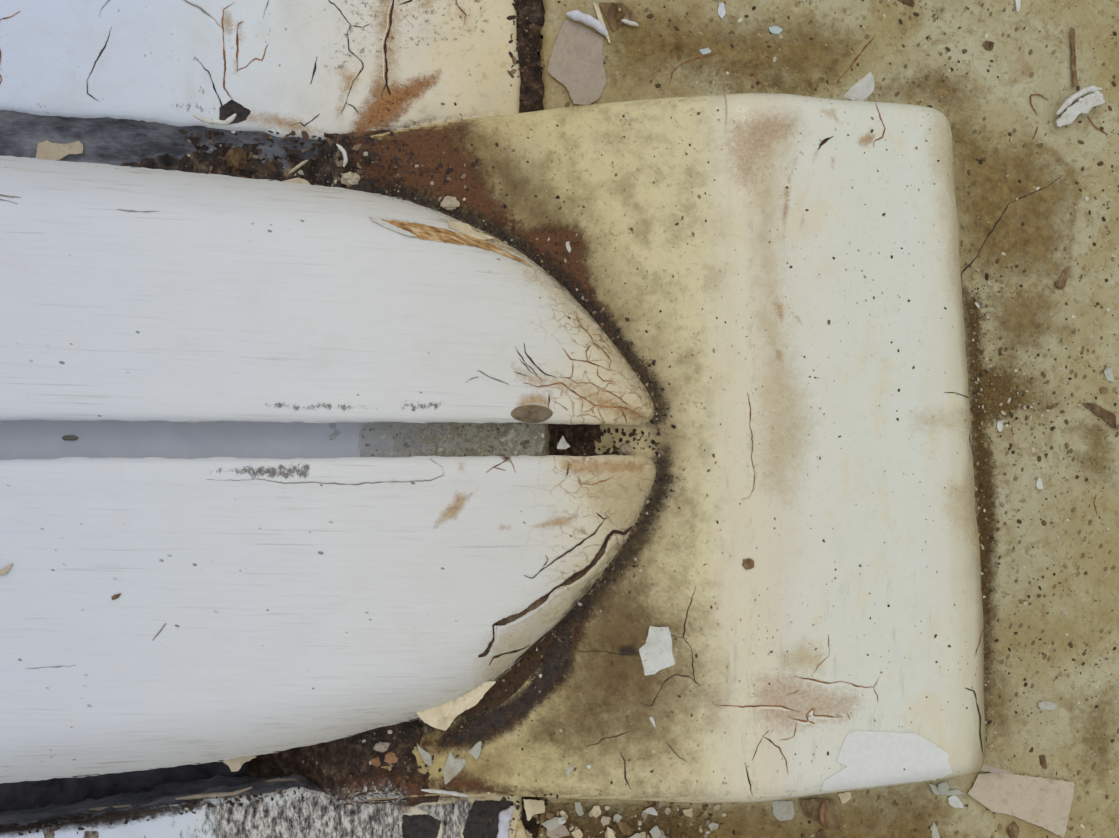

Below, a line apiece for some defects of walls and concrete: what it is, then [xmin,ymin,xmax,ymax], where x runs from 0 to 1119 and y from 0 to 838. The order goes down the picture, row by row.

crack [87,0,117,101]
crack [184,0,269,119]
spalling [219,100,250,125]
crack [290,0,412,127]
corrosion [348,0,623,349]
crack [961,177,1060,304]
crack [465,313,643,423]
crack [478,464,636,666]
crack [639,587,879,798]
peeling [196,779,513,838]
crack [587,729,633,789]
peeling [772,731,1075,838]